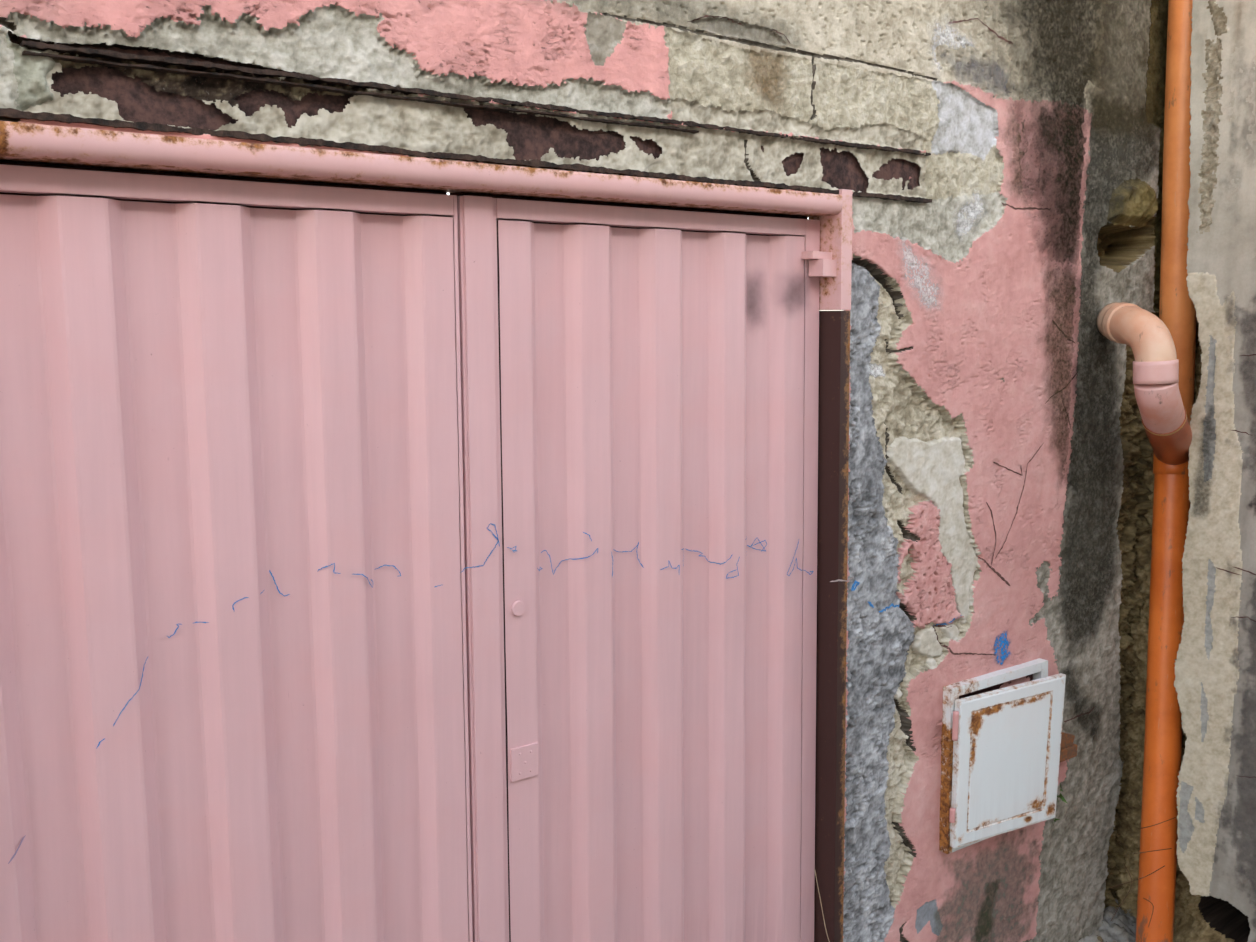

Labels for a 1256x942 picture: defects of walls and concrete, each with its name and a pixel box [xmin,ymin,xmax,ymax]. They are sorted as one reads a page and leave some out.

peeling [0,0,1106,263]
water stain [1012,0,1164,646]
spalling [1194,317,1202,403]
water stain [1229,314,1256,393]
water stain [1194,419,1213,514]
crack [977,444,1043,586]
spalling [869,273,982,909]
water stain [1234,582,1256,675]
water stain [1222,690,1256,886]
peeling [915,899,943,936]
spalling [1173,859,1250,942]